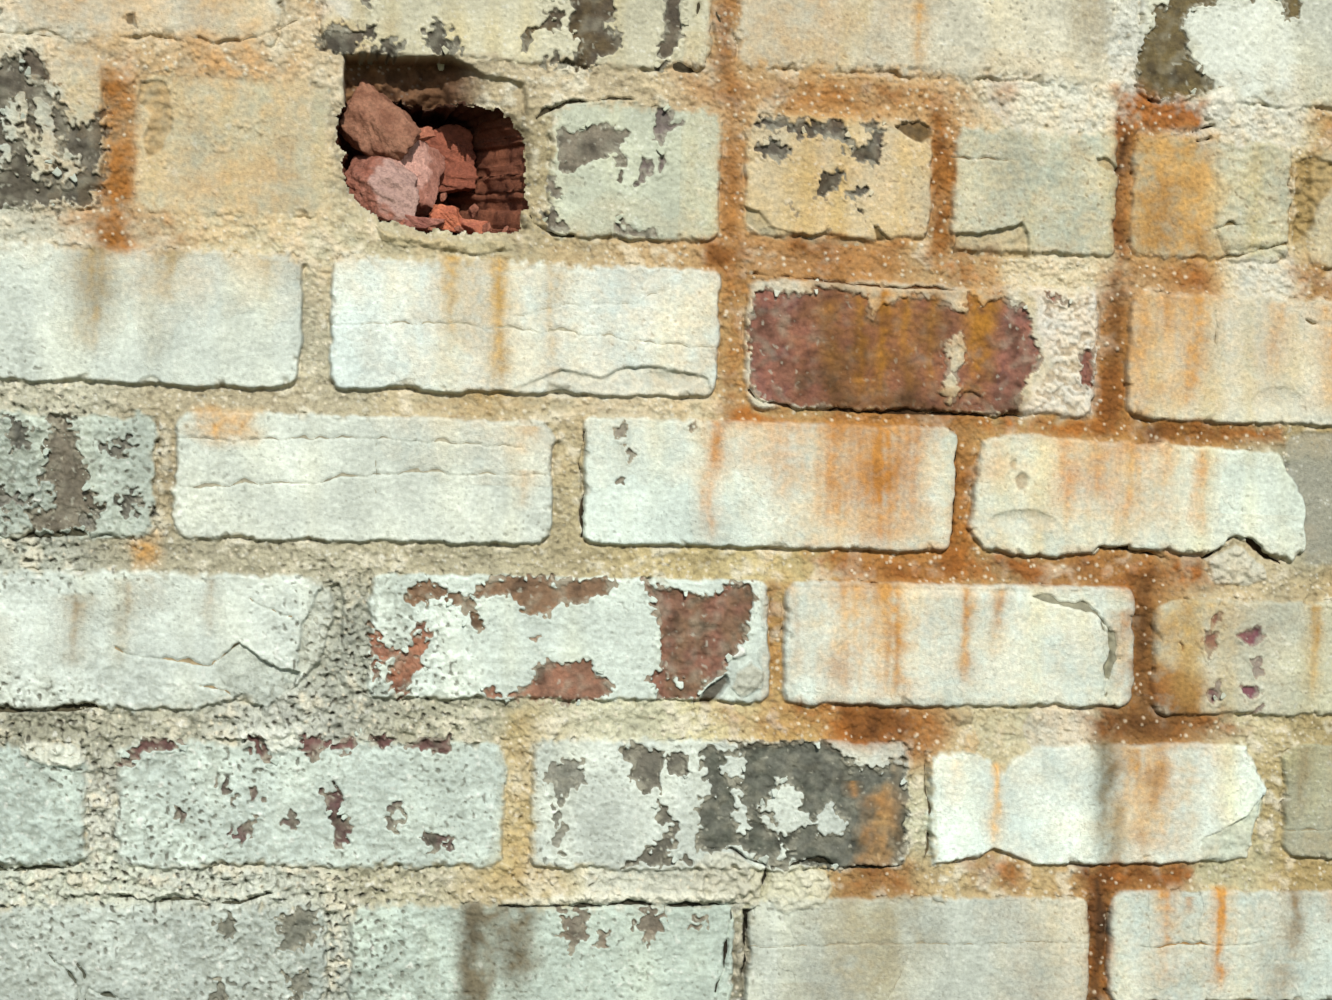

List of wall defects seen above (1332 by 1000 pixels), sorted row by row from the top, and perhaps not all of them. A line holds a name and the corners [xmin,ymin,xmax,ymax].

peeling [520,0,624,73]
peeling [1134,0,1218,95]
spalling [392,99,685,239]
corrosion [0,0,1026,511]
peeling [0,412,160,535]
corrosion [123,525,168,576]
corrosion [683,0,1332,1000]
peeling [366,573,619,708]
peeling [639,576,758,701]
peeling [618,740,909,872]
crack [498,902,538,910]
crack [570,754,1066,998]